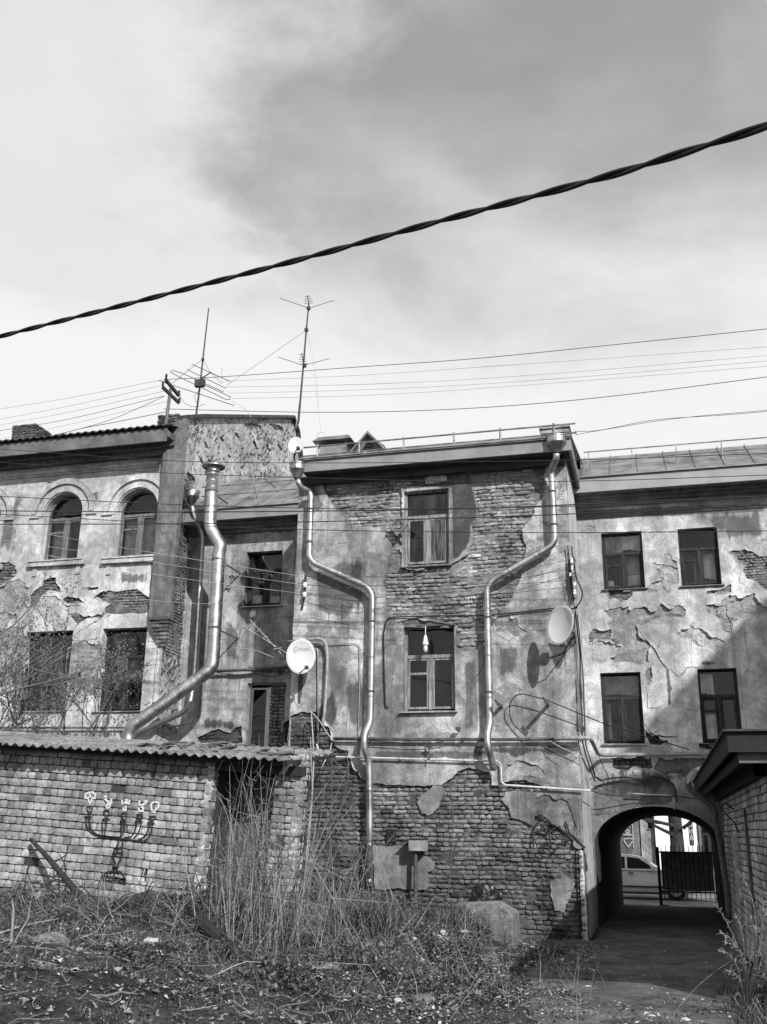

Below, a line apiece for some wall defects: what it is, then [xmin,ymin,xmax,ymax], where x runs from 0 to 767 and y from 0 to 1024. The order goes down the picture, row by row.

spalling [0,563,149,686]
flaking render [323,467,548,653]
peeling [589,548,767,685]
spalling [198,727,243,743]
flaking render [281,712,588,940]